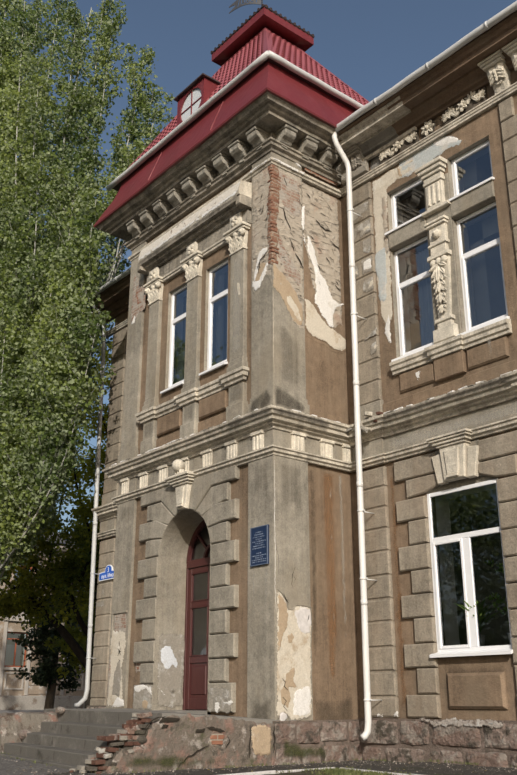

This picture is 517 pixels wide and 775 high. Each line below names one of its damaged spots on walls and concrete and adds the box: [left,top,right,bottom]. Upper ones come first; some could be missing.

flaking render [131,275,146,324]
peeling [138,182,240,260]
spalling [250,157,346,354]
peeling [353,136,461,355]
flaking render [77,630,185,774]
flaking render [207,688,233,713]
flaking render [275,589,313,721]